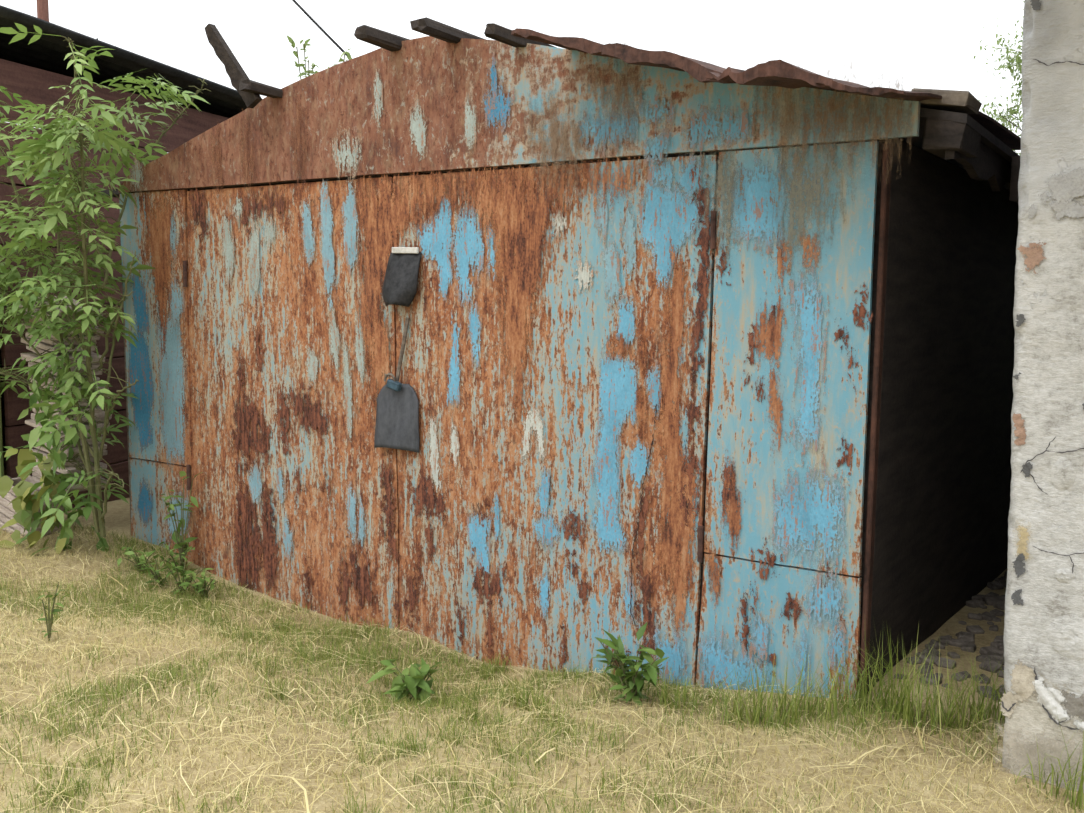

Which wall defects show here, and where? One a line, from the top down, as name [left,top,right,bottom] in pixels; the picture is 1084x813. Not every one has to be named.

peeling [128,207,187,469]
corrosion [231,328,331,597]
peeling [301,129,366,442]
peeling [416,196,497,493]
corrosion [354,156,648,421]
corrosion [603,158,732,675]
peeling [574,87,788,562]
corrosion [720,456,782,652]
corrosion [743,229,820,451]
peeling [769,258,851,688]
crack [1020,437,1084,495]
spalling [999,659,1084,731]